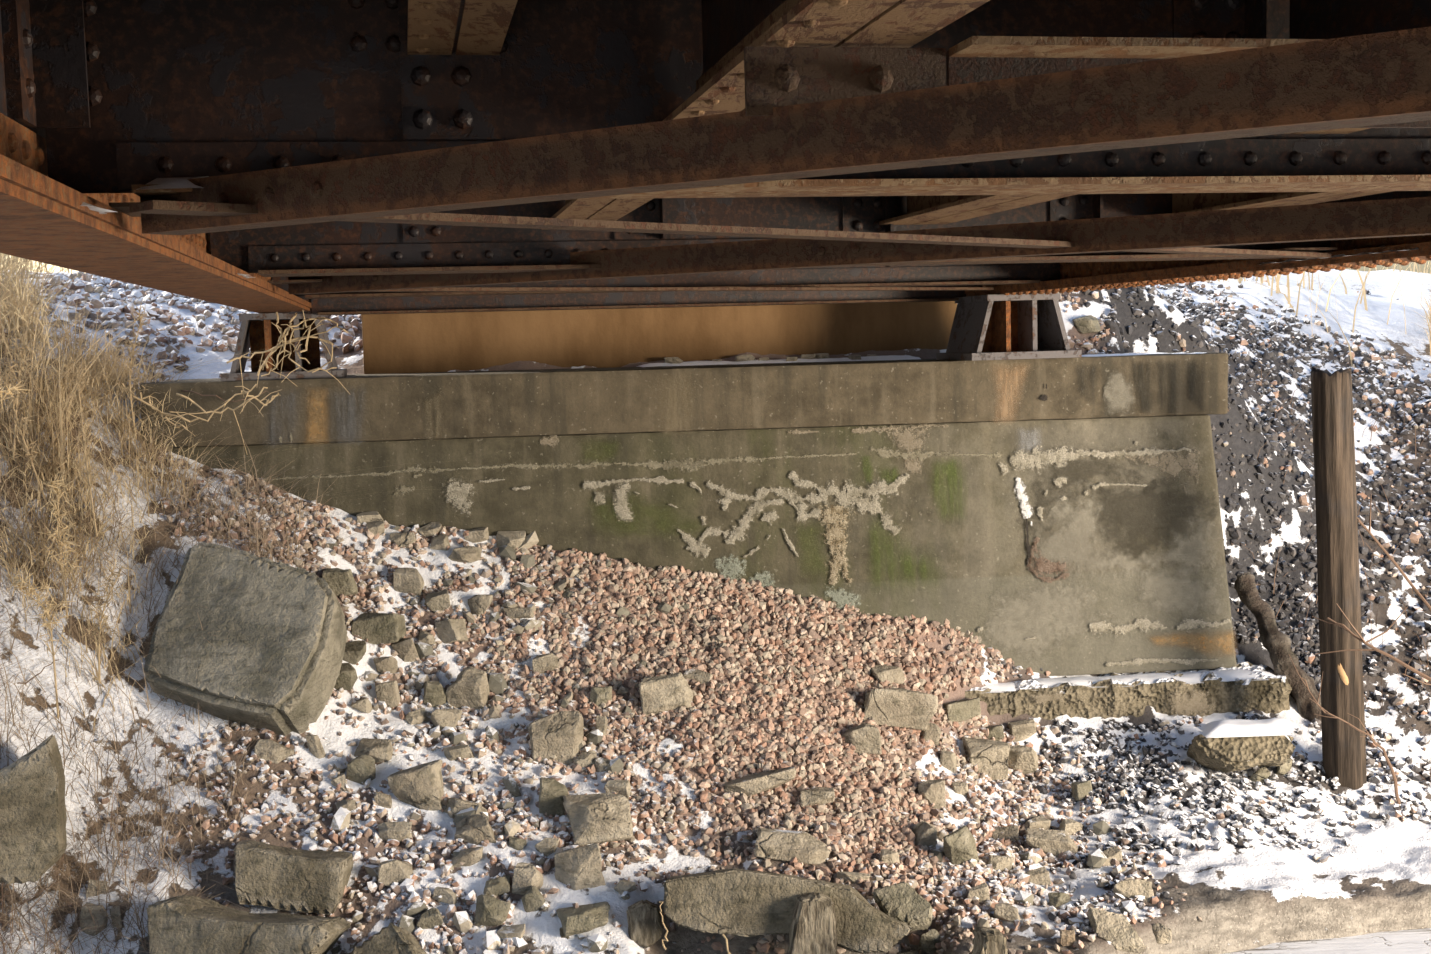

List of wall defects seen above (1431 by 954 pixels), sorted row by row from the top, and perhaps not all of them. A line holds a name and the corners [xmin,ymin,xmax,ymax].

water stain [263,424,1216,556]
water stain [818,504,856,586]